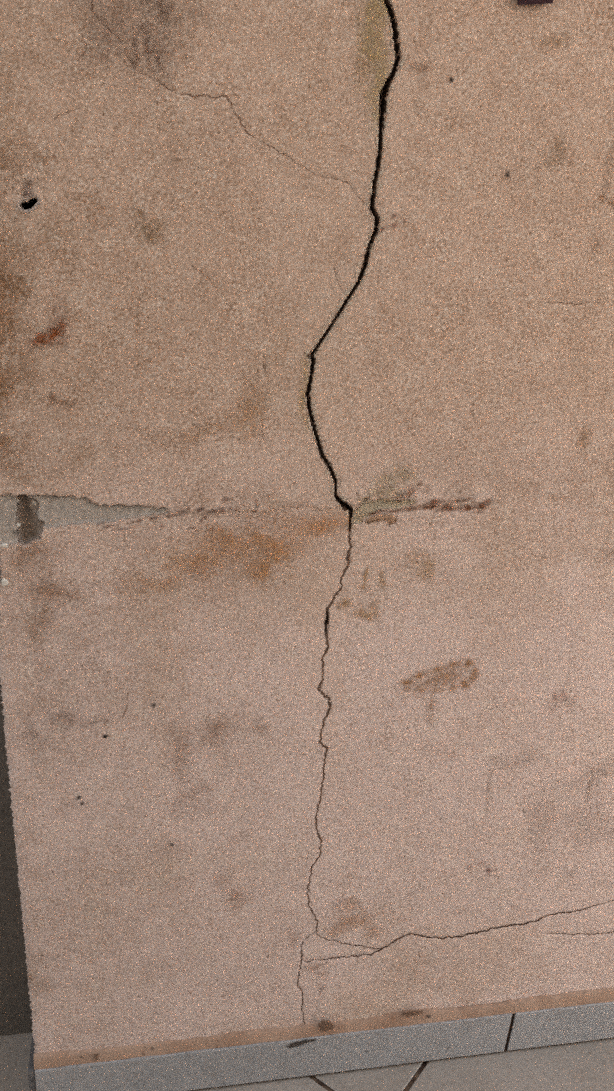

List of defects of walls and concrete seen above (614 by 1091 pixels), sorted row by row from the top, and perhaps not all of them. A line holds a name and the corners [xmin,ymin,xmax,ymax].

spalling [0,494,168,548]
crack [127,0,614,1023]